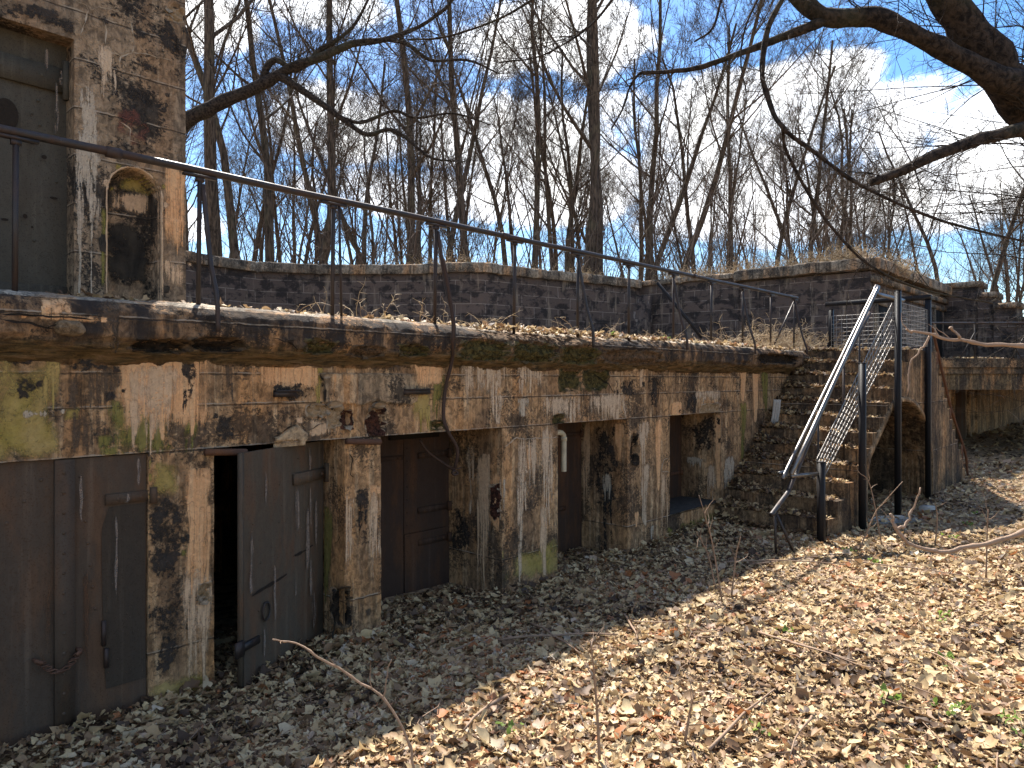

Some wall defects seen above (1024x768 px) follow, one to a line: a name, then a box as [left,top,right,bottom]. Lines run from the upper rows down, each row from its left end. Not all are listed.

leakage [75,46,191,353]
leakage [9,359,196,455]
spalling [324,401,388,437]
leakage [346,488,381,565]
leakage [451,447,490,589]
leakage [462,366,505,424]
leakage [503,367,668,583]
leakage [679,391,735,500]
leakage [149,497,212,681]